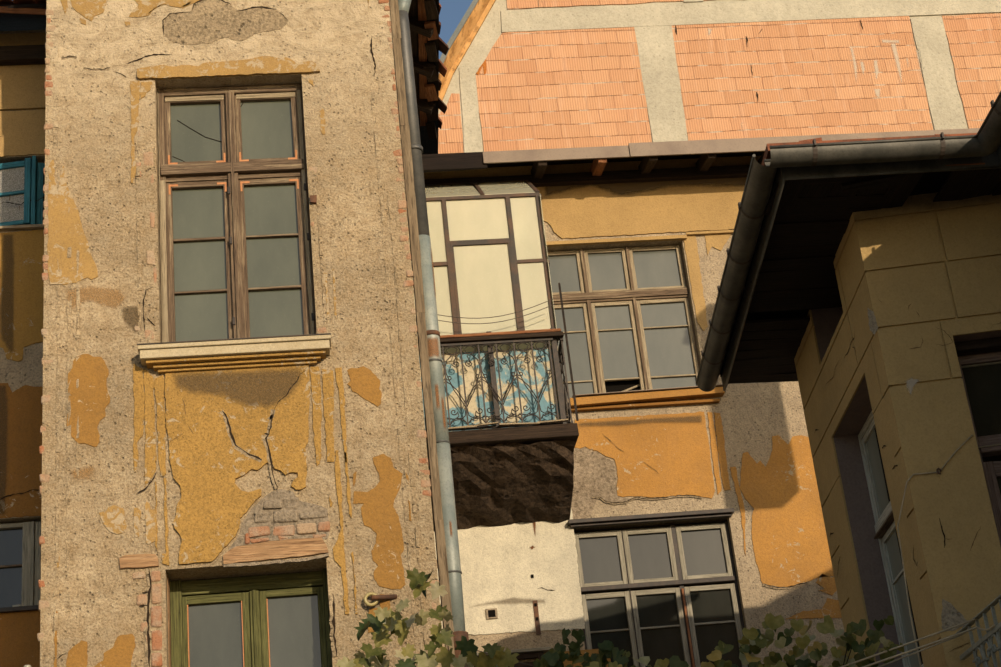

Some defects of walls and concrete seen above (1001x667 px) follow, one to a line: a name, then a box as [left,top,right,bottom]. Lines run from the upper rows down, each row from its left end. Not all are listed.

flaking render [44,0,108,97]
spalling [125,0,288,45]
flaking render [0,109,98,362]
flaking render [130,56,320,183]
spalling [391,69,414,294]
flaking render [66,354,110,447]
crack [219,372,303,489]
flaking render [99,364,412,633]
flaking render [458,411,842,635]
flaking render [0,580,137,667]